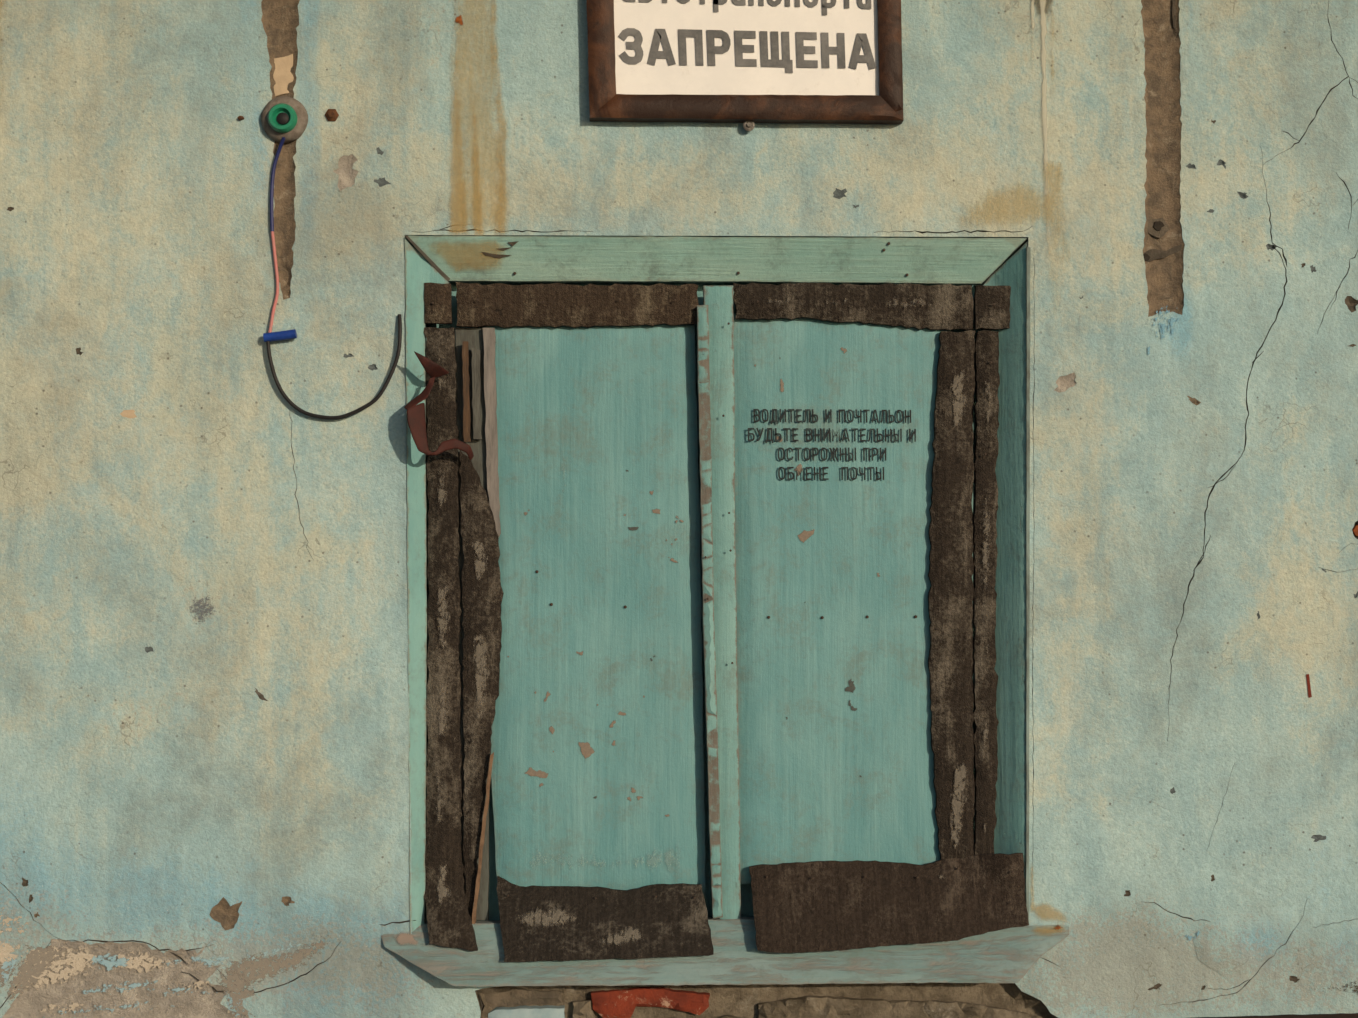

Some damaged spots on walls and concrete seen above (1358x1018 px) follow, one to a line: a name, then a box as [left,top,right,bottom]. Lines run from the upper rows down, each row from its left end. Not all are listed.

spalling [261,0,300,99]
spalling [273,140,297,300]
spalling [1141,0,1196,317]
crack [1167,4,1358,741]
peeling [0,878,328,1018]